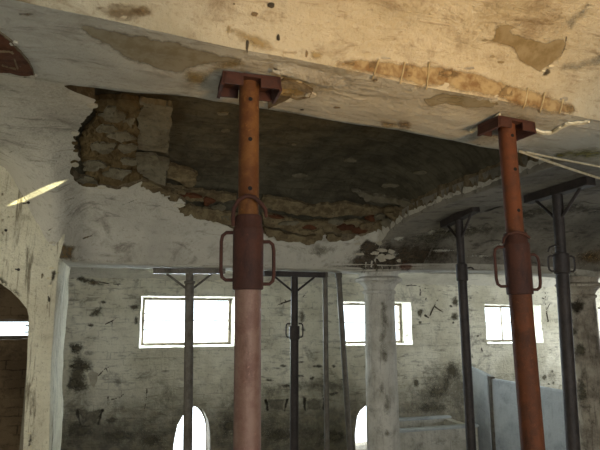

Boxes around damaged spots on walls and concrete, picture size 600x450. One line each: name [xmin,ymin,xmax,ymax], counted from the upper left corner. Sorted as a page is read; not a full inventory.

peeling [482,20,566,76]
flaking render [338,57,574,116]
flaking render [536,120,590,135]
flaking render [65,85,239,229]
flaking render [259,78,501,262]
flaking render [518,153,544,167]
water stain [68,344,90,392]
water stain [414,364,464,411]